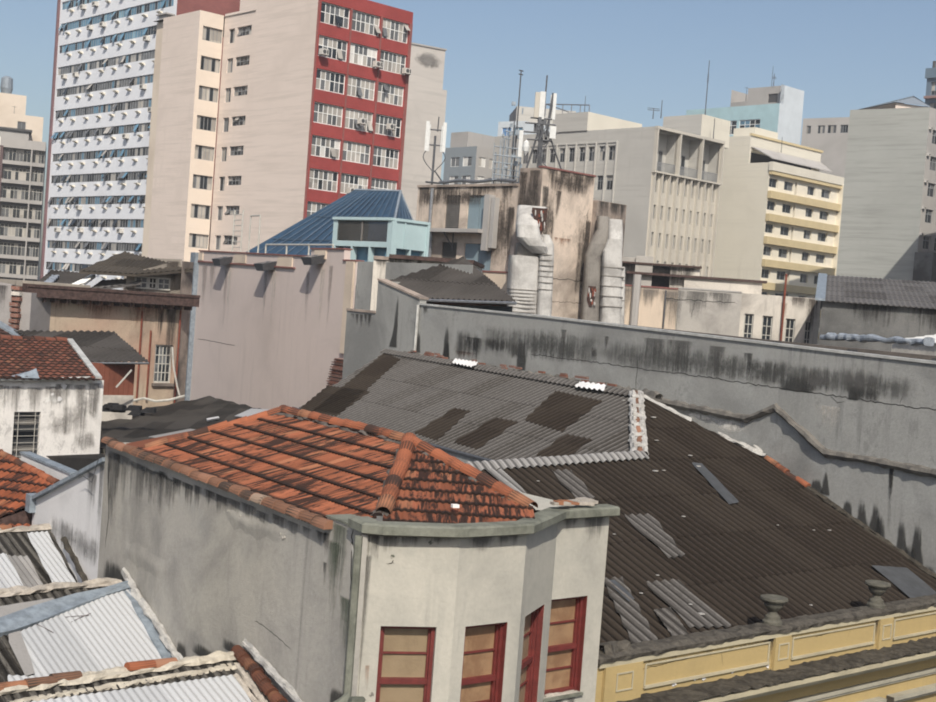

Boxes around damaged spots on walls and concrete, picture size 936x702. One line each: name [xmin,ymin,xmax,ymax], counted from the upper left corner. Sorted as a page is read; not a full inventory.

leakage [420,169,594,252]
leakage [575,222,591,291]
leakage [443,330,596,370]
leakage [605,336,905,401]
leakage [0,383,100,445]
leakage [89,452,345,576]
leakage [812,474,829,495]
leakage [105,565,125,581]
leakage [177,644,211,658]